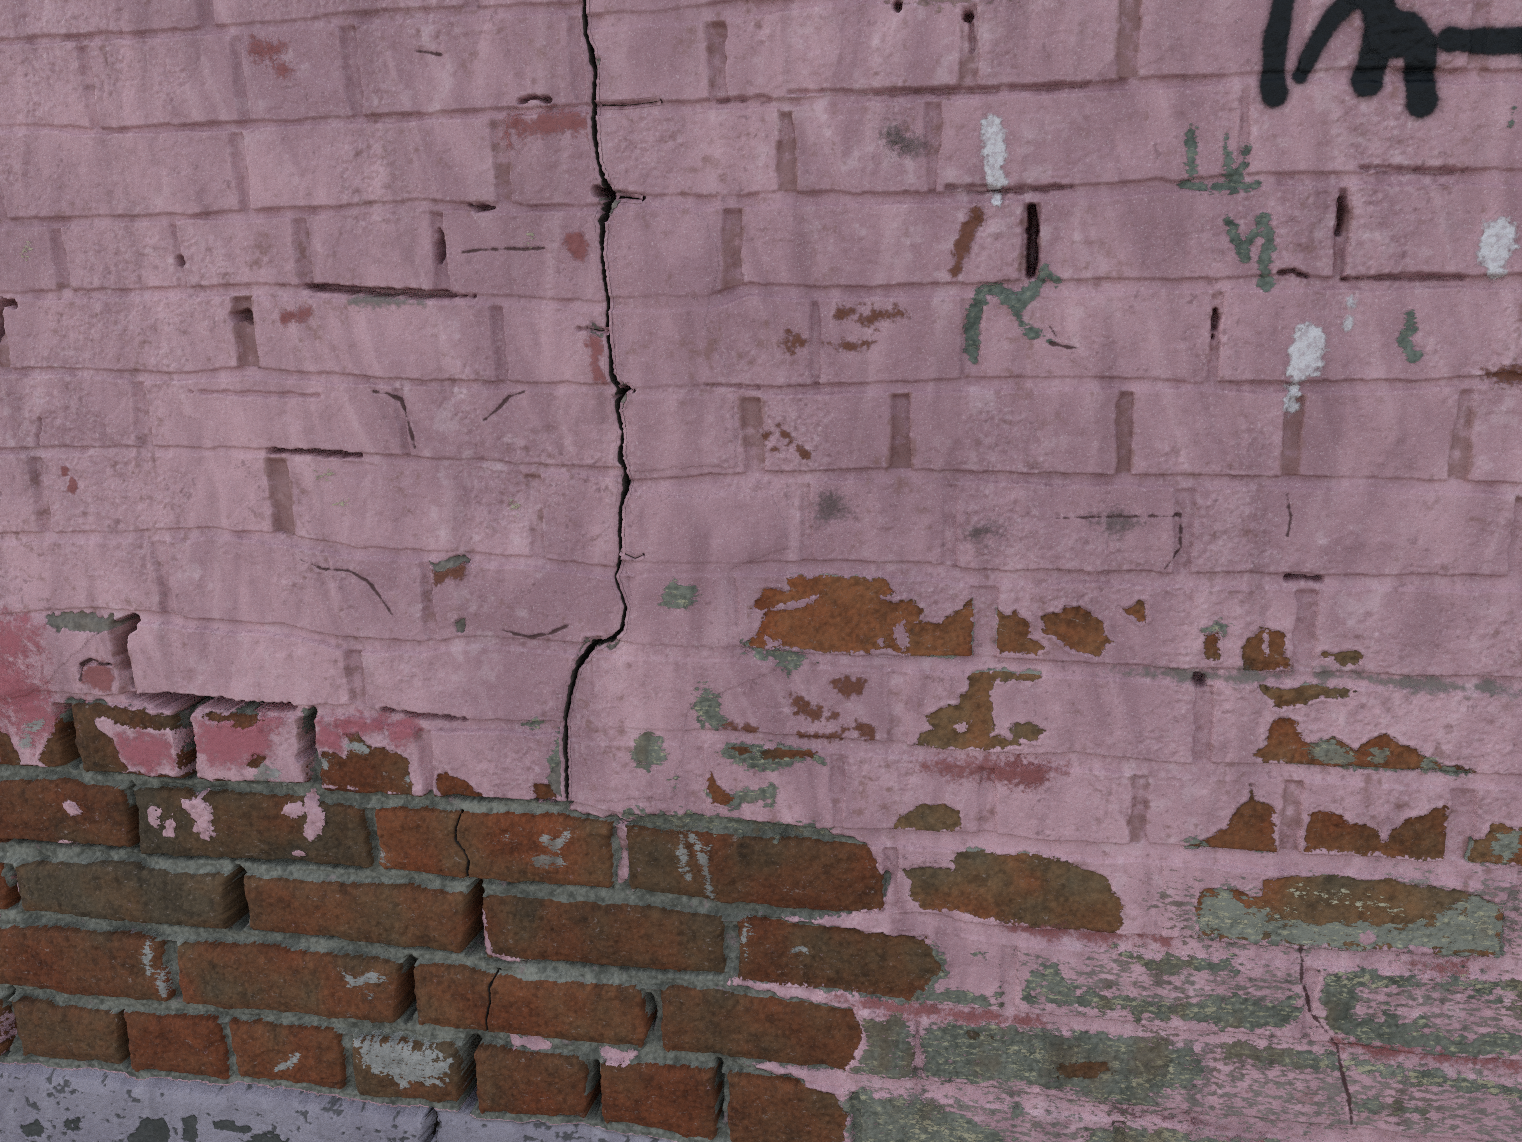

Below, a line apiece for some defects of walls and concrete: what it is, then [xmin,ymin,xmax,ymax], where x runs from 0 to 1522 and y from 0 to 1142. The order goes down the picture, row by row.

crack [506,0,662,801]
crack [301,560,391,614]
spalling [429,555,470,572]
peeling [657,576,702,612]
spalling [46,610,139,633]
spalling [455,618,465,633]
peeling [740,572,1114,751]
peeling [1201,617,1477,780]
peeling [0,681,1522,1142]